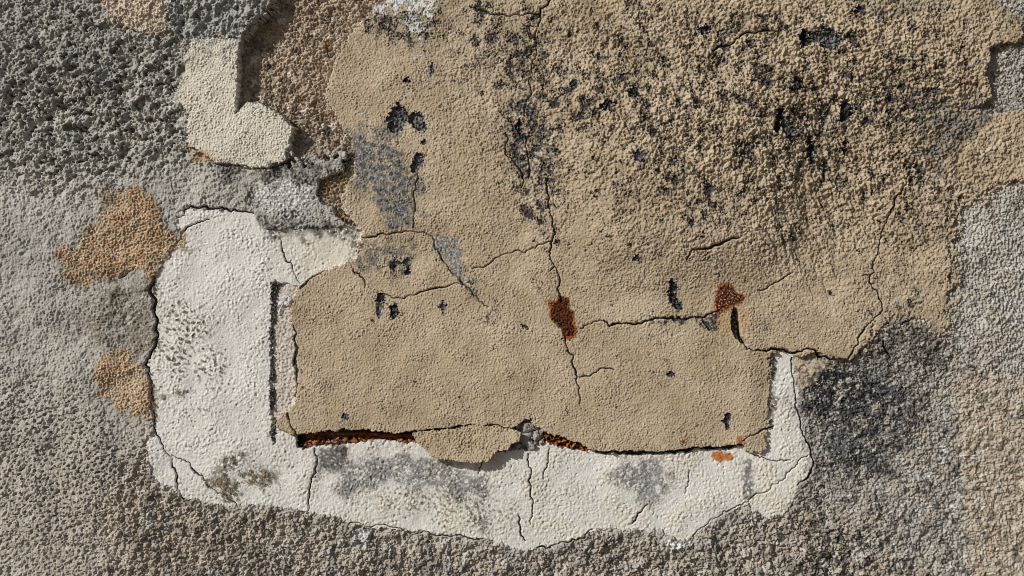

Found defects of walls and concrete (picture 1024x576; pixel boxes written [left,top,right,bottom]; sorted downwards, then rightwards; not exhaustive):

mould [505,67,556,205]
crack [353,133,562,307]
rust [297,428,417,458]
peeling [143,0,816,552]
rust [548,296,577,340]
rust [543,433,589,452]
crack [565,311,717,404]
rust [714,283,744,313]
crack [686,161,914,535]
damp [804,324,942,470]
crack [350,522,483,540]